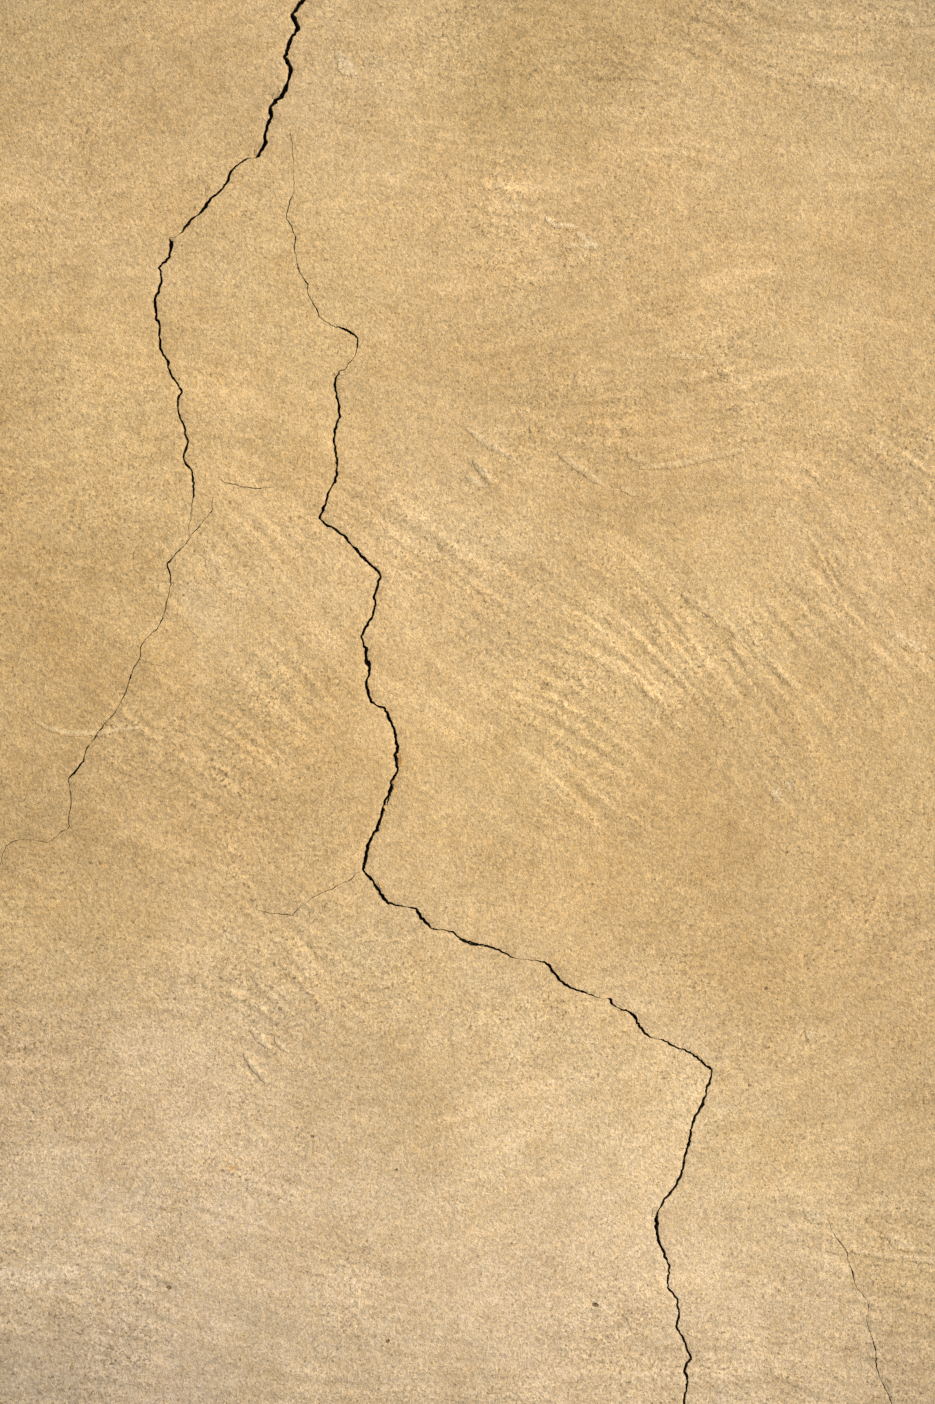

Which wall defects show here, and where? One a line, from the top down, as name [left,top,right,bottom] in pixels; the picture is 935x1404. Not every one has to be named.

crack [0,0,713,1404]